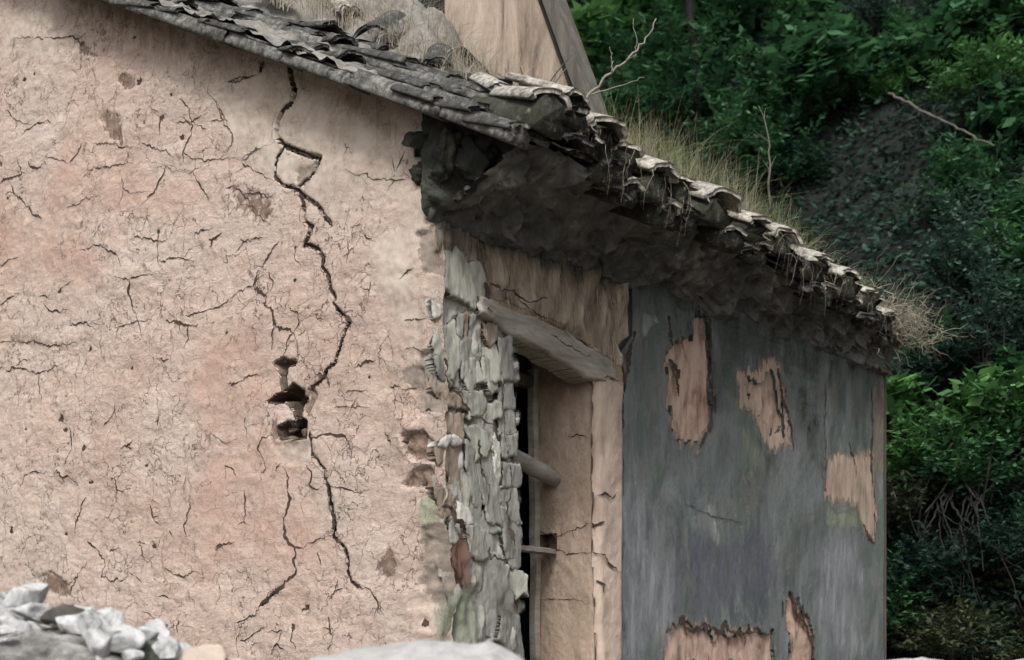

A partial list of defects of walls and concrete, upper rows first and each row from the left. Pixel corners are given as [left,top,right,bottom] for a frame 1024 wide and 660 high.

crack [9,35,94,59]
crack [0,62,409,409]
flaking render [401,230,529,660]
flaking render [663,316,716,457]
flaking render [736,357,792,452]
crack [20,419,379,657]
flaking render [823,450,879,541]
flaking render [661,618,771,660]
flaking render [785,593,815,660]